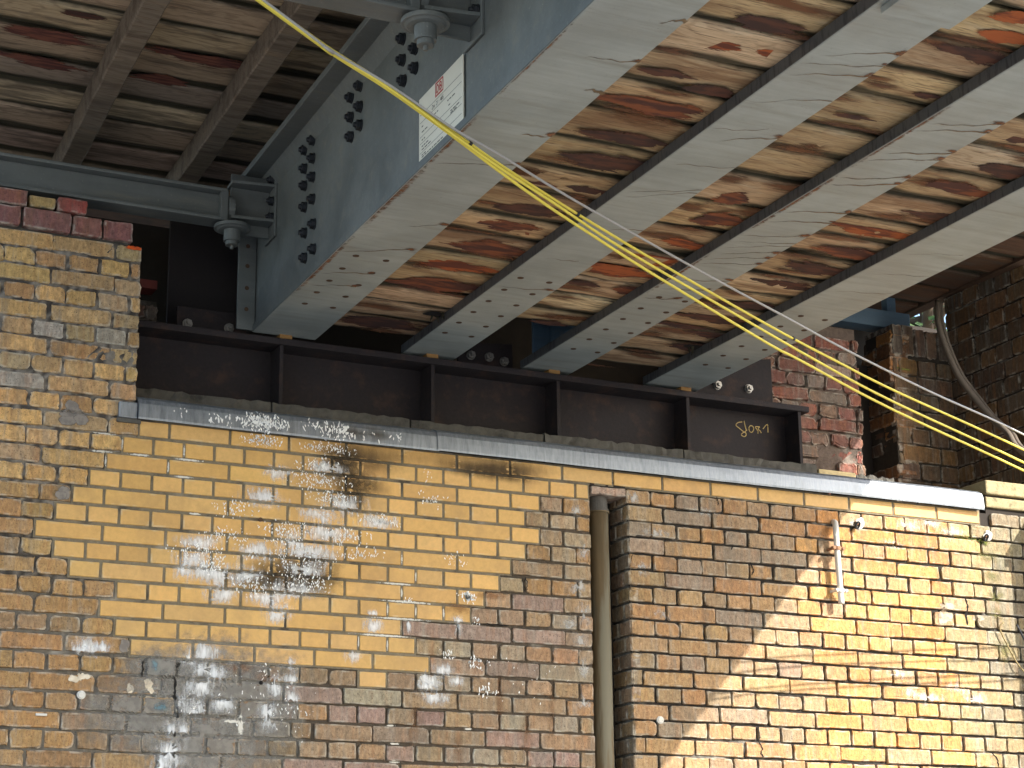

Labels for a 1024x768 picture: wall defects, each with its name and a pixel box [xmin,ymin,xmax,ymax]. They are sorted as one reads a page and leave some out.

leakage [165,411,401,621]
leakage [348,573,430,662]
leakage [178,644,309,736]
leakage [418,649,459,702]
efflorescence [157,725,187,768]